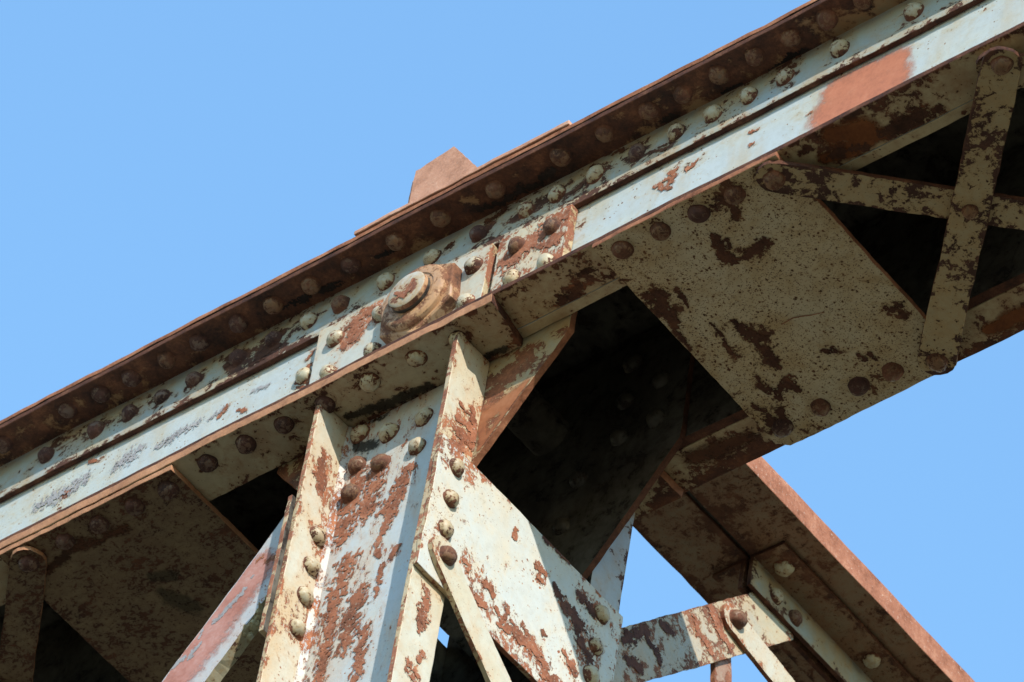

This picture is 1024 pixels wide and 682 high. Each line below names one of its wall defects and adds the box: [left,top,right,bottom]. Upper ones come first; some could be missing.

peeling [652,158,699,191]
corrosion [477,379,530,451]
peeling [312,447,328,506]
corrosion [684,431,755,465]
peeling [373,476,410,560]
corrosion [46,522,133,577]
corrosion [163,549,274,682]
peeling [404,650,426,682]
peeling [416,583,432,636]
peeling [473,573,559,682]
peeling [533,560,598,678]
peeling [621,619,677,676]